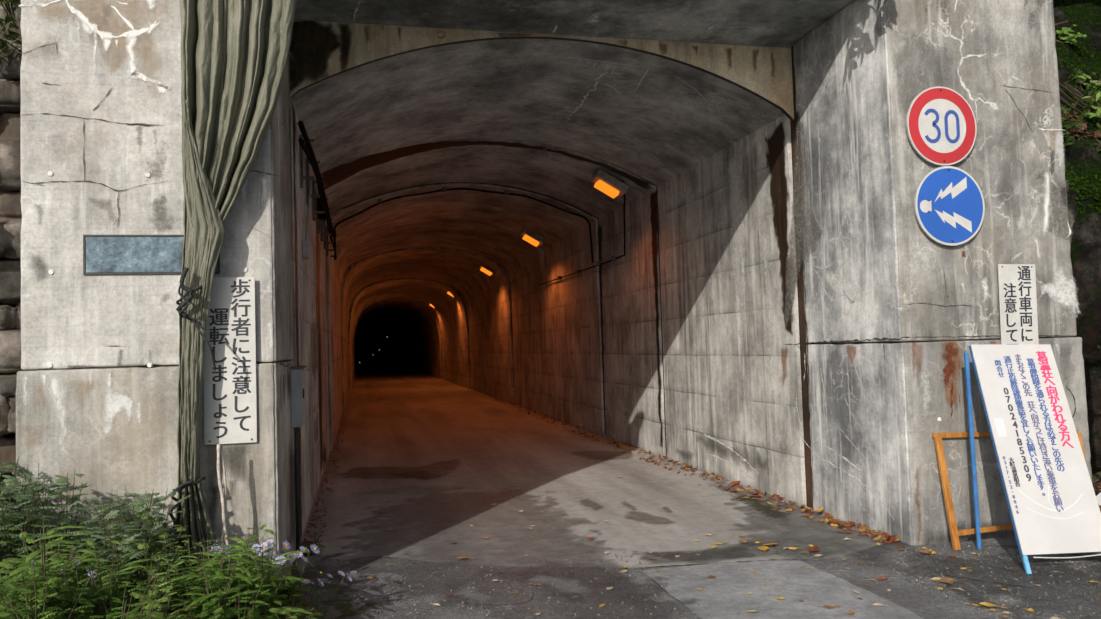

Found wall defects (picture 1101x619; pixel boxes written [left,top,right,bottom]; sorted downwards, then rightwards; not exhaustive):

crack [19,0,170,230]
water stain [289,3,360,92]
crack [937,0,1052,150]
crack [984,157,1027,262]
crack [912,251,981,309]
water stain [1042,270,1078,315]
rust [943,342,960,416]